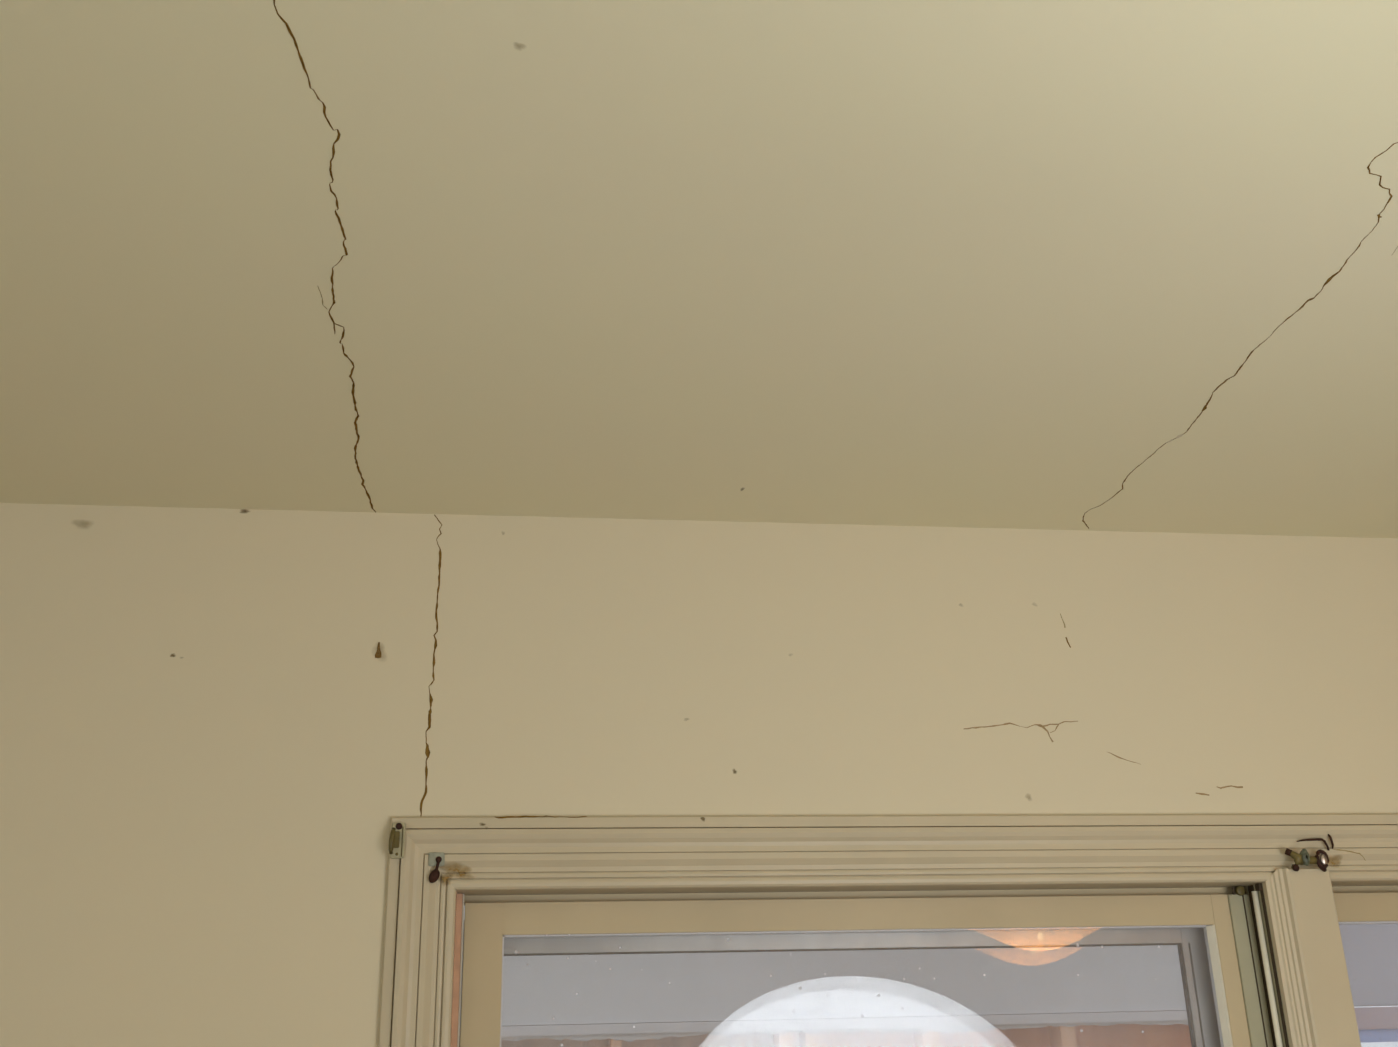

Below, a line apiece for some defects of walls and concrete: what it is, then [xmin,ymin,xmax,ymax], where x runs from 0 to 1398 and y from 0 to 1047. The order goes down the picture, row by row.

crack [273,0,376,512]
crack [1082,142,1398,529]
crack [420,515,442,817]
crack [963,721,1077,742]